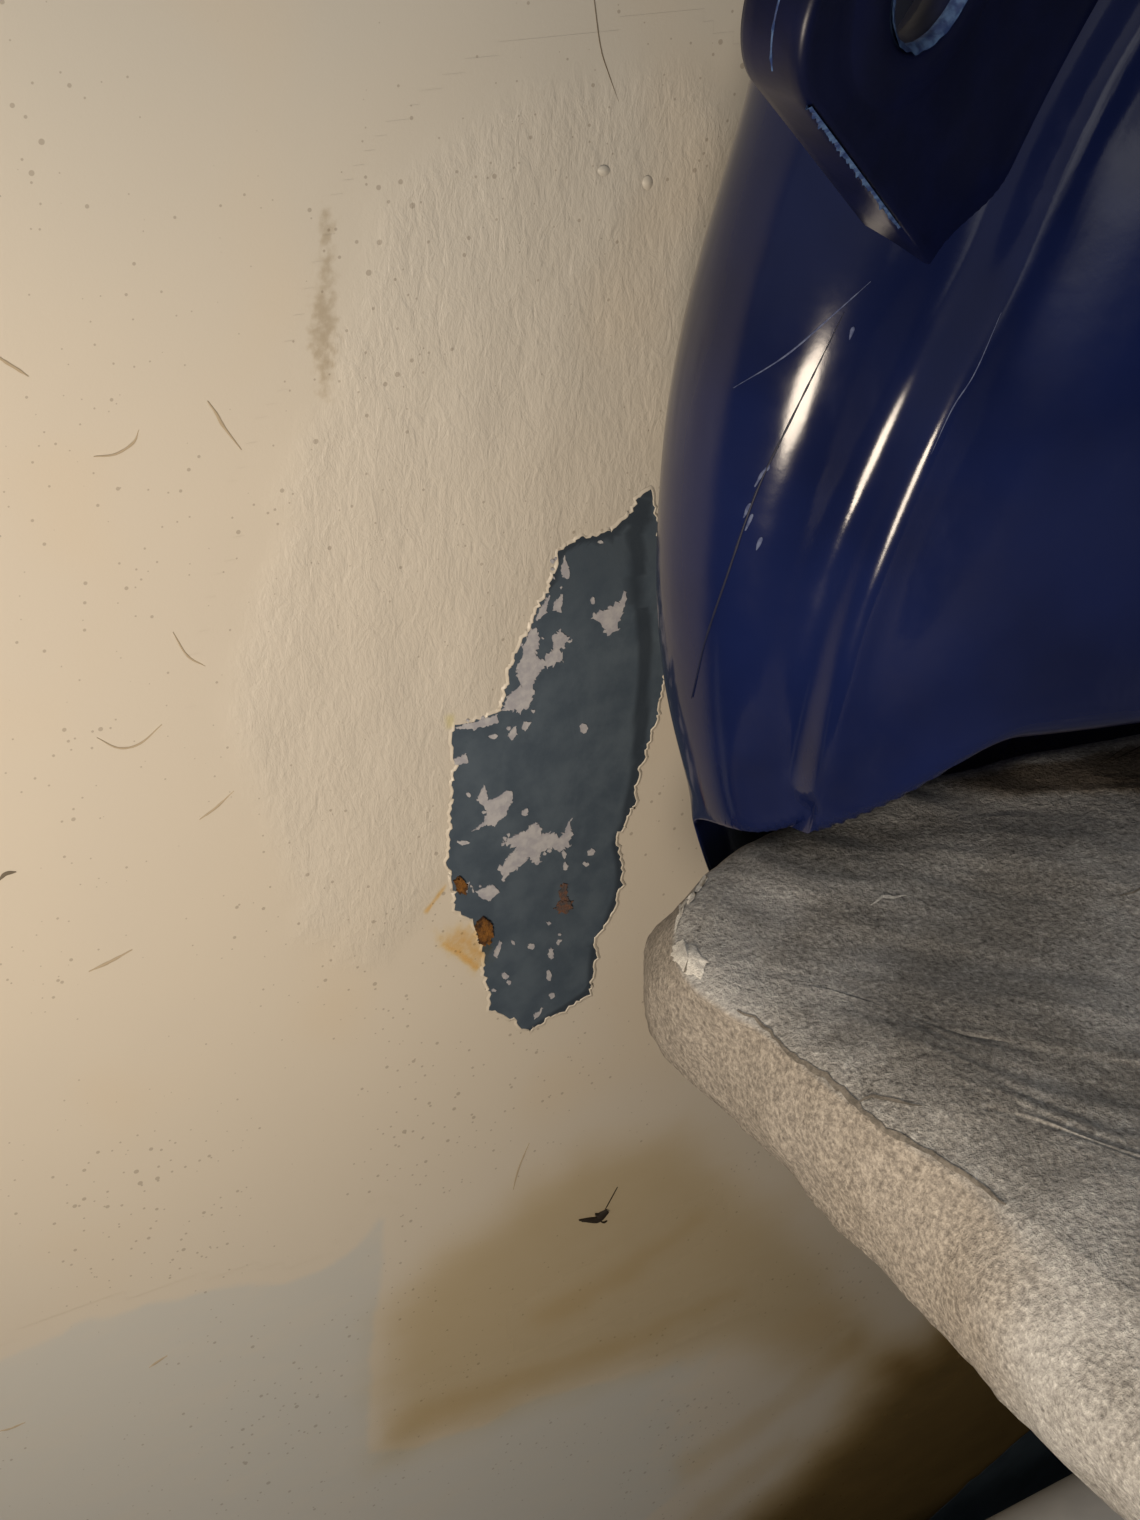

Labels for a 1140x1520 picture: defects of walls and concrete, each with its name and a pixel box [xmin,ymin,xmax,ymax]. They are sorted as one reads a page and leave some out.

peeling [443,486,665,1034]
rust [453,876,468,895]
rust [474,916,494,946]
leakage [776,1346,1031,1520]